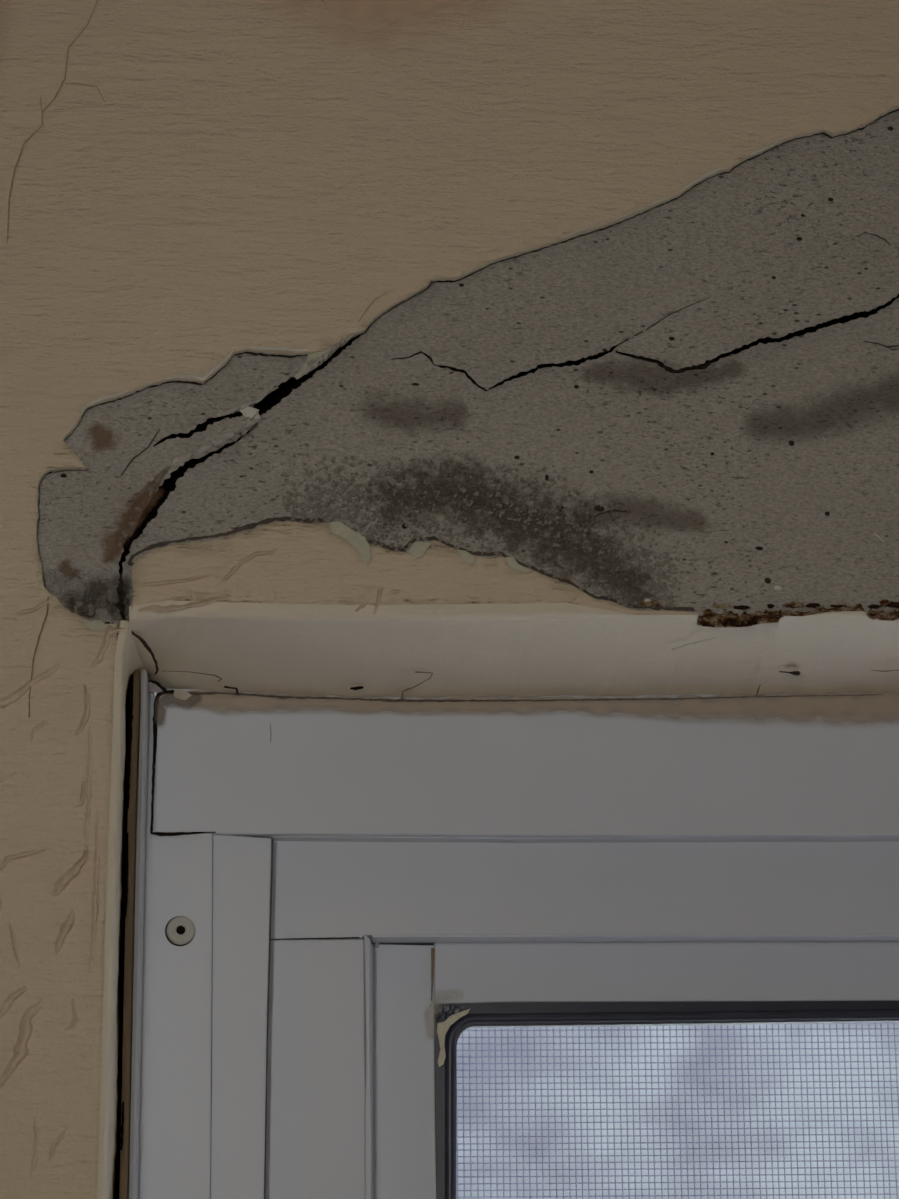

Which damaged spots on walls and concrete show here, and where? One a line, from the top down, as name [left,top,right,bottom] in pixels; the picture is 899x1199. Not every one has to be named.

crack [28,597,49,717]
crack [103,292,388,695]
spalling [37,109,899,628]
crack [391,294,899,391]